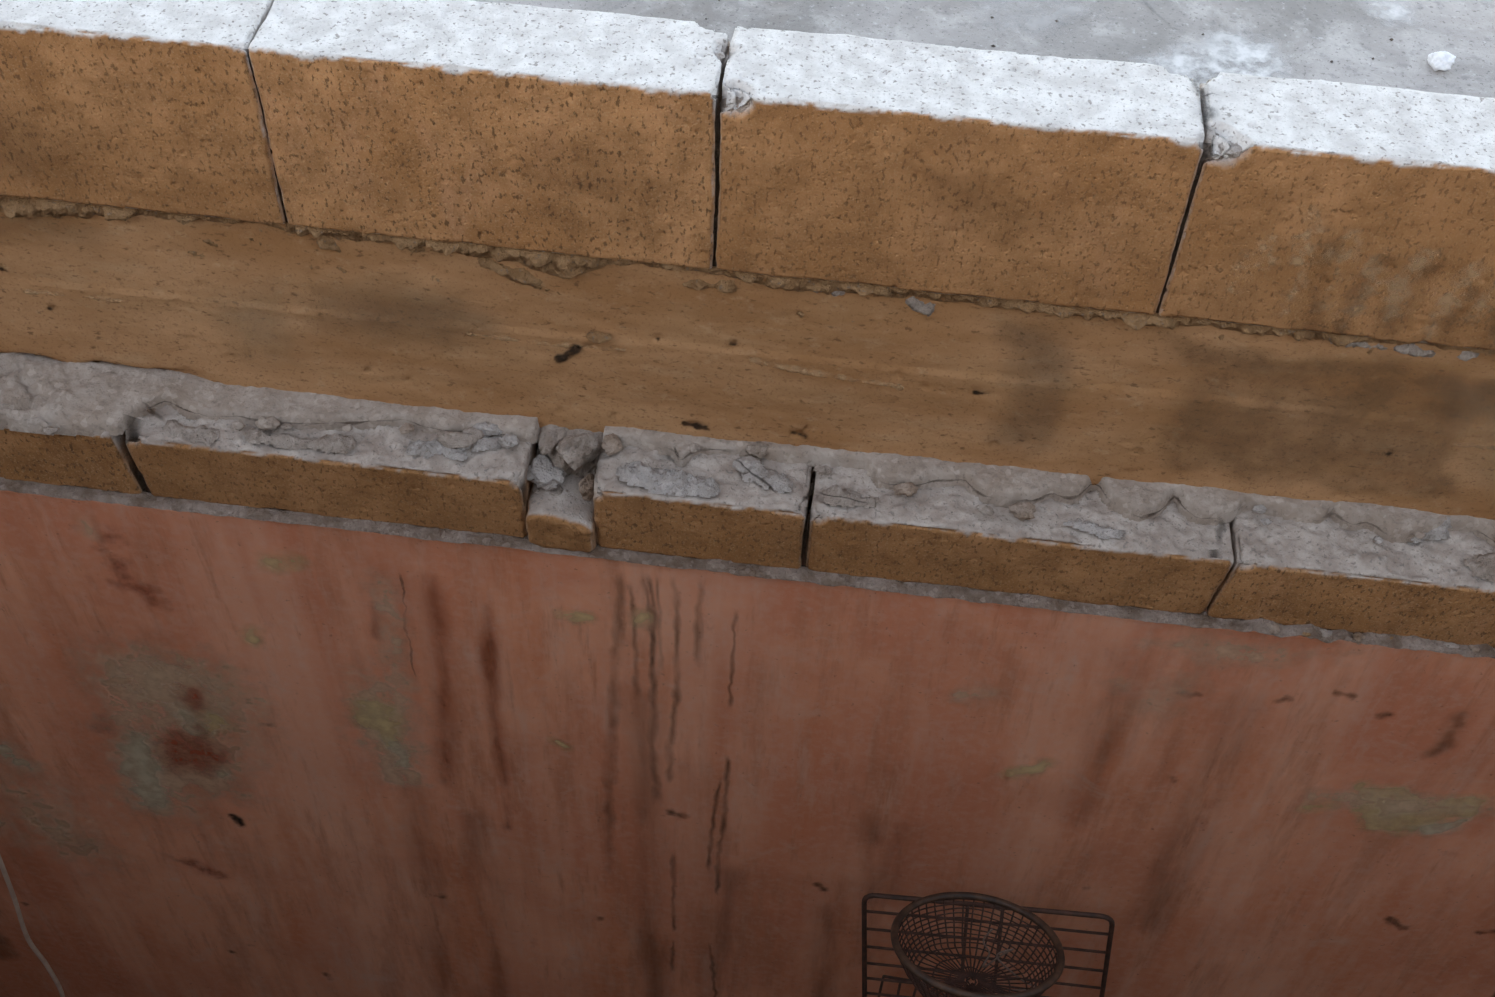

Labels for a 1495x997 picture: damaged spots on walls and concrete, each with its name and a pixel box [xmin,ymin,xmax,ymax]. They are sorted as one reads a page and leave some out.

crack [245,49,288,222]
crack [712,46,729,267]
crack [1156,82,1214,313]
crack [127,401,230,493]
spalling [682,421,709,430]
crack [674,448,984,567]